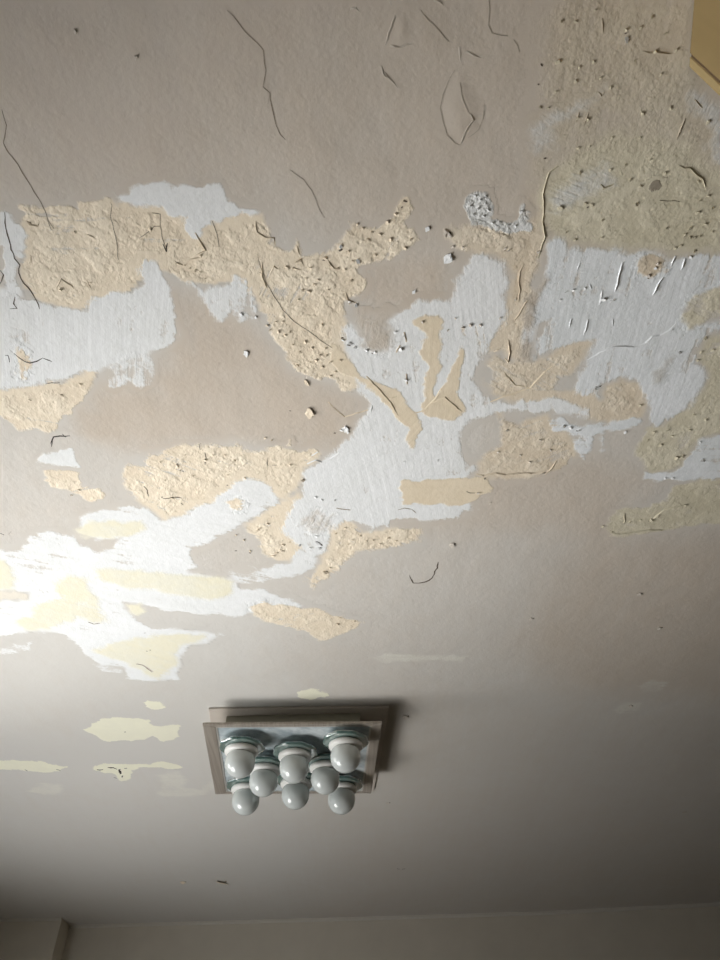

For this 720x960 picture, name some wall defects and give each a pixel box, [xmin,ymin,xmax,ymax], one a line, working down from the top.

crack [228,11,284,138]
crack [2,112,52,229]
peeling [0,0,720,452]
peeling [40,434,340,542]
peeling [395,461,557,509]
peeling [0,497,431,683]
peeling [0,758,72,774]
peeling [78,697,186,744]
peeling [87,759,215,799]